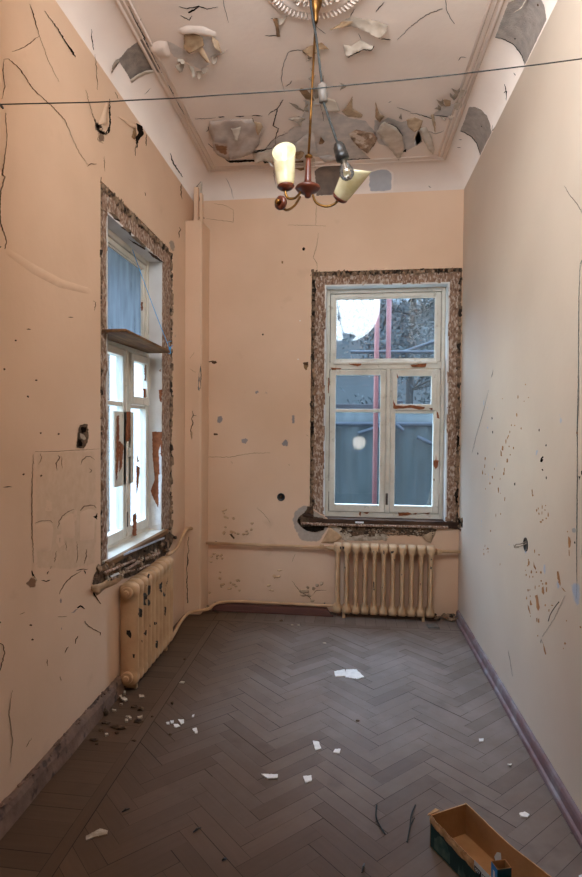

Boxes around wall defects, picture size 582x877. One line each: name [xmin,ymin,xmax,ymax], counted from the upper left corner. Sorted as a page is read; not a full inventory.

peeling [111,25,227,83]
peeling [265,16,287,37]
peeling [330,10,390,58]
crack [397,0,455,40]
peeling [495,0,546,65]
crack [0,5,118,248]
peeling [206,75,492,196]
spalling [292,267,463,543]
spalling [525,549,553,623]